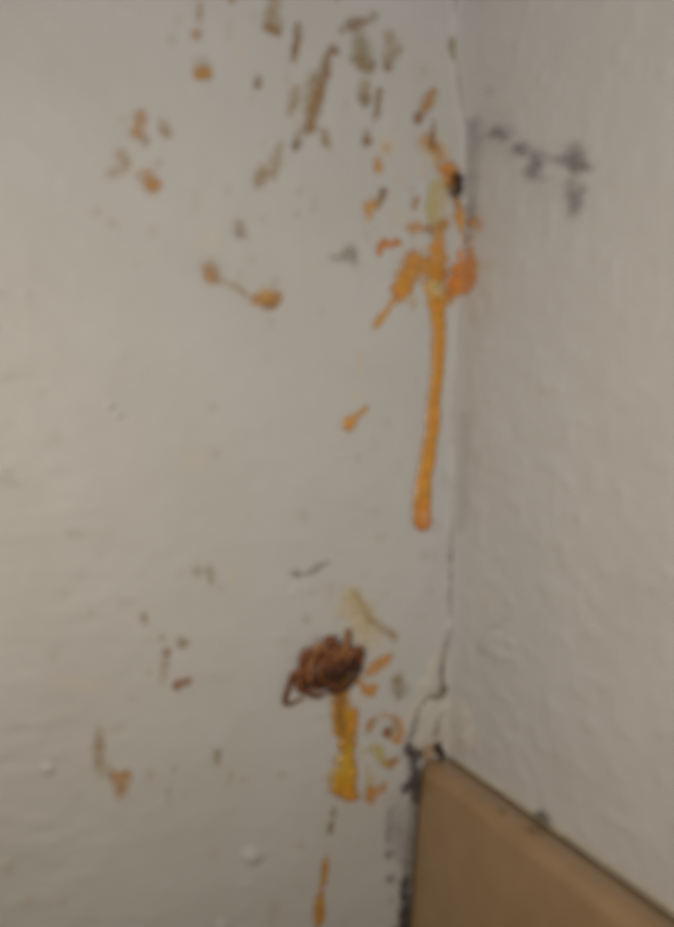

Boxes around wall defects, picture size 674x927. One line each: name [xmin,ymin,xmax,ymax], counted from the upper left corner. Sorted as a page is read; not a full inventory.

crack [430,670,447,699]